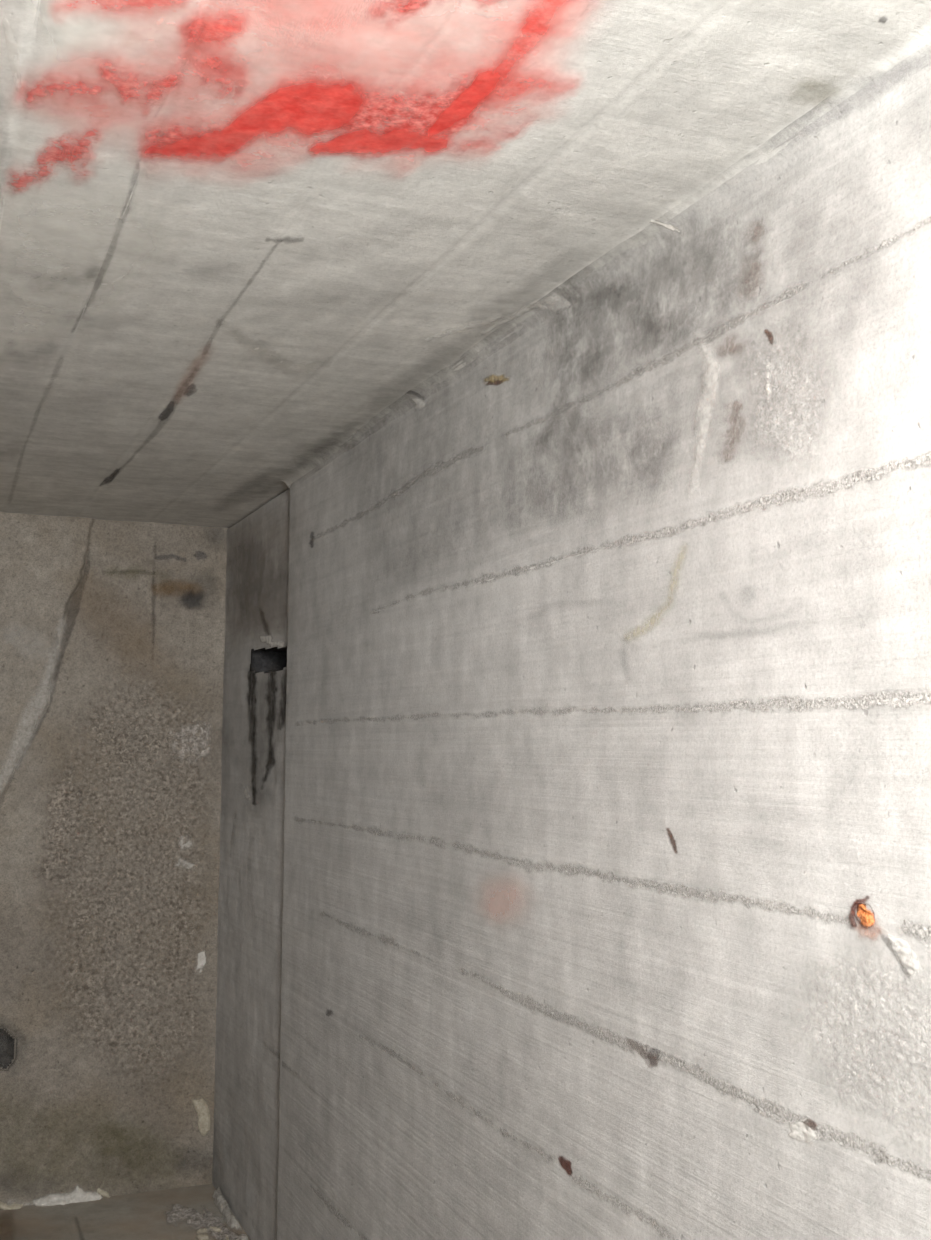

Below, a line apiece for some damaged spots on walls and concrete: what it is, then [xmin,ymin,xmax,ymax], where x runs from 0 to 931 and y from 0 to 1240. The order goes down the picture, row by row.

crack [159,386,195,420]
crack [101,470,119,485]
water stain [247,669,287,804]
corrosion [857,904,875,927]